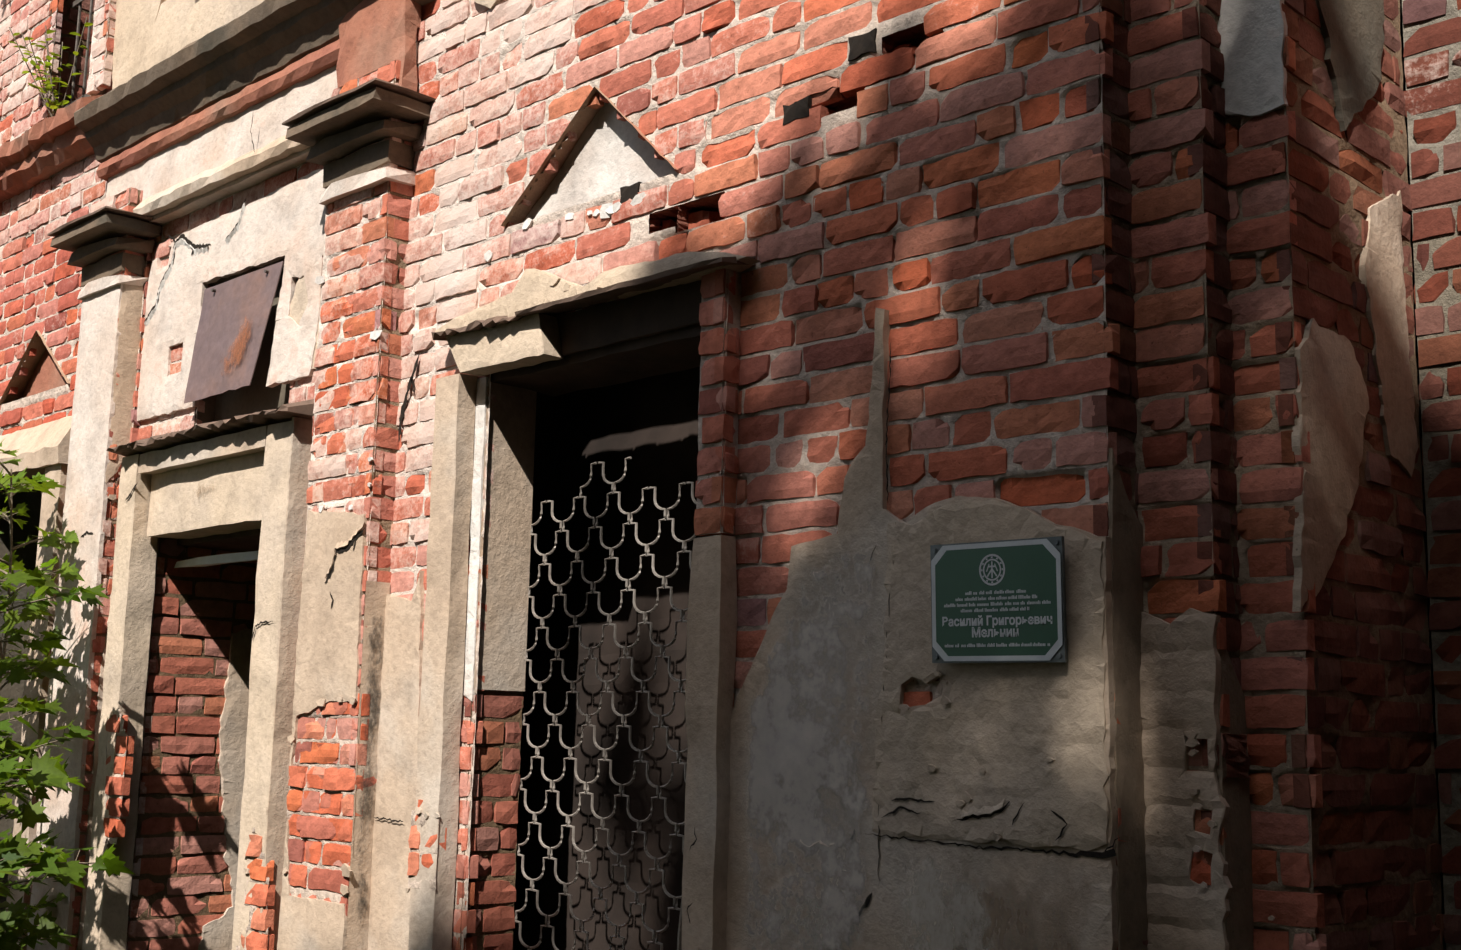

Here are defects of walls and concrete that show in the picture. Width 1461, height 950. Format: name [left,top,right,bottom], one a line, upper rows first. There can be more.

hole [848,19,943,62]
corrosion [225,318,250,368]
crack [325,522,365,608]
flaking render [898,671,951,710]
flaking render [236,693,370,950]
flaking render [1190,845,1212,889]